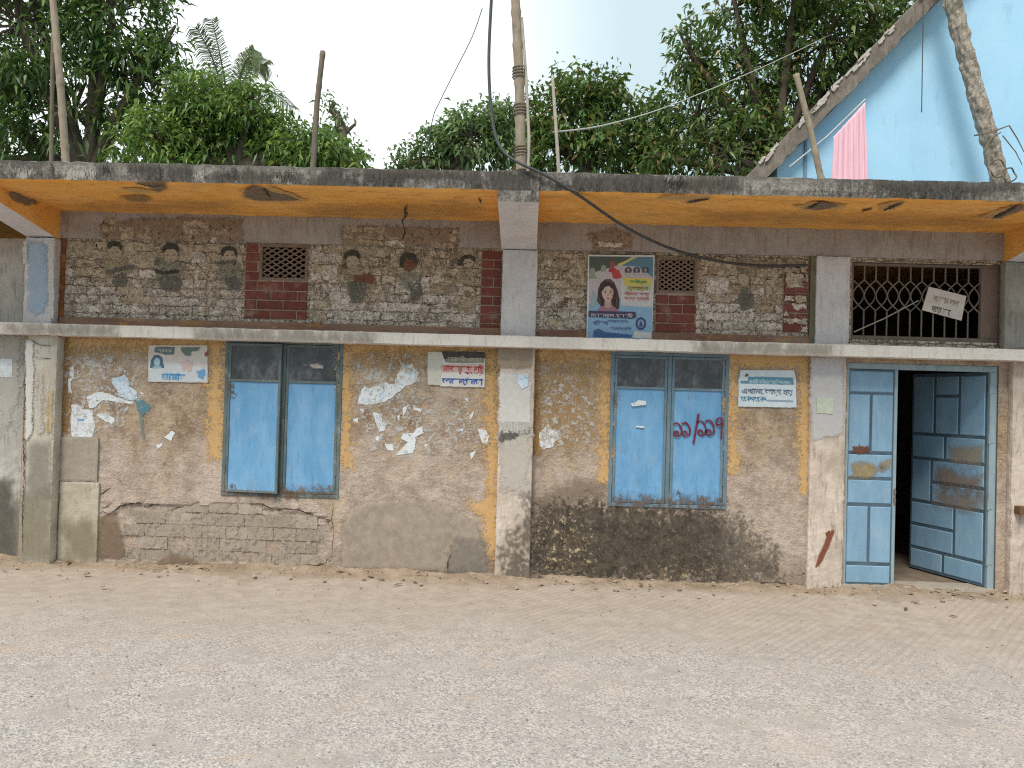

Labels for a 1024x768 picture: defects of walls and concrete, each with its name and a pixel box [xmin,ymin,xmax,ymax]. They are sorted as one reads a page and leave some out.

crack [402,205,424,308]
flaking render [697,258,809,332]
peeling [0,335,226,467]
flaking render [97,503,326,571]
corrosion [221,481,337,499]
peeling [333,344,616,569]
damp [498,481,779,584]
corrosion [608,493,726,514]
corrosion [816,530,834,567]
corrosion [852,444,892,479]